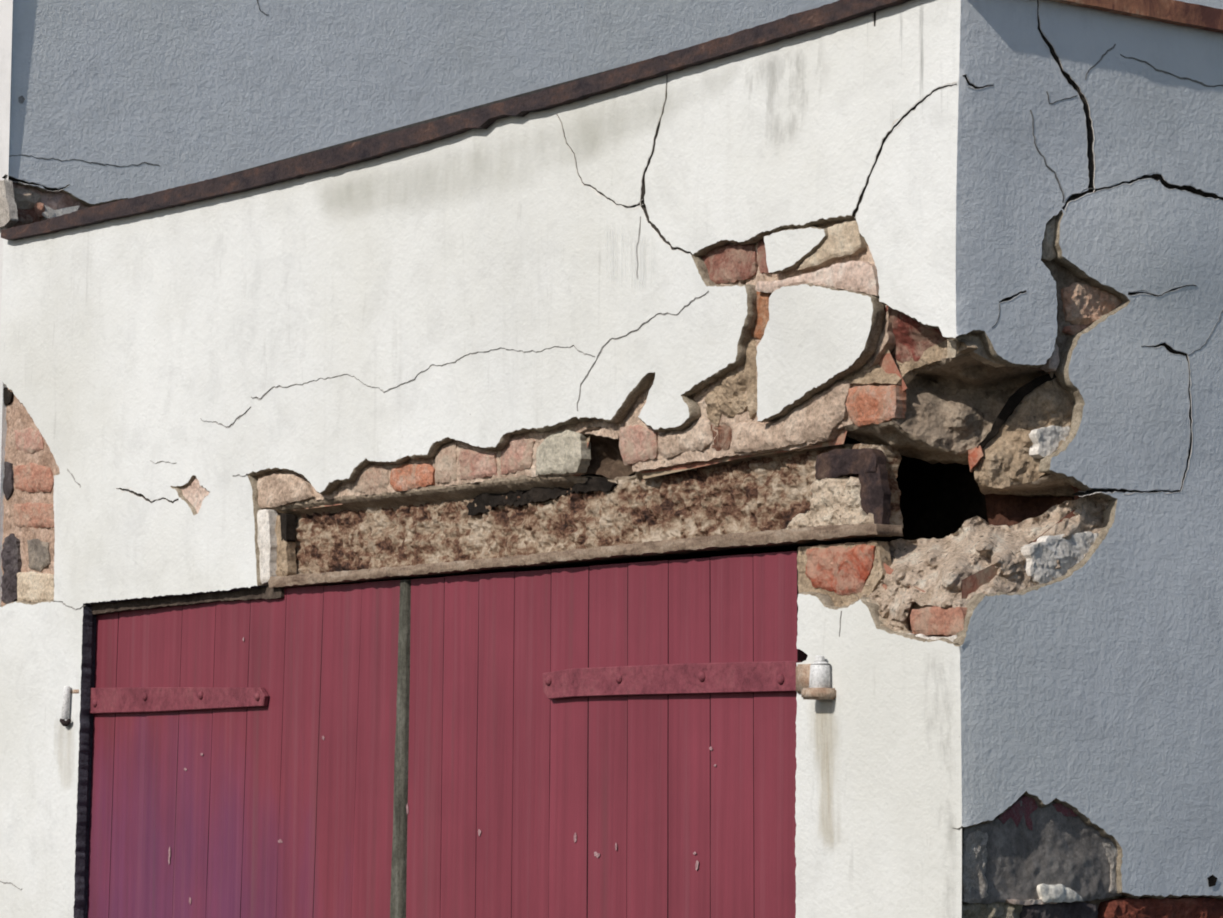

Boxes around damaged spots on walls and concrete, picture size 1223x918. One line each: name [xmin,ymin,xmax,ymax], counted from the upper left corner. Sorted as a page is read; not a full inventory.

spalling [0,180,111,229]
crack [2,154,159,191]
crack [556,75,692,279]
crack [851,74,993,218]
crack [1030,0,1223,212]
spalling [0,387,60,606]
crack [118,488,179,504]
spalling [180,478,210,513]
crack [200,291,709,428]
spalling [257,217,1122,642]
crack [1072,310,1223,497]
spalling [962,795,1223,918]